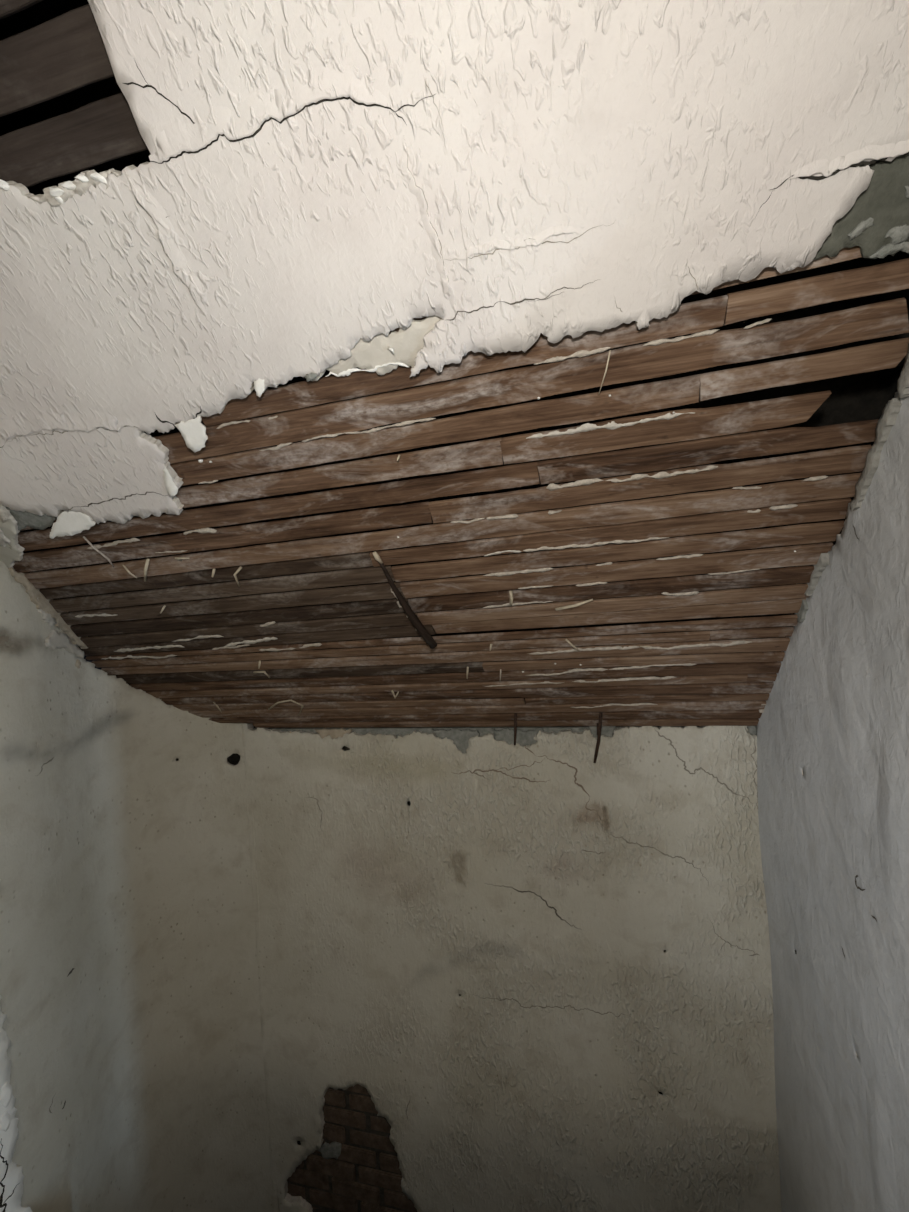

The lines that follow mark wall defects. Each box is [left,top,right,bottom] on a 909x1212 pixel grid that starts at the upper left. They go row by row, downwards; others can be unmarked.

flaking render [29,168,130,207]
crack [123,64,622,323]
flaking render [814,153,909,260]
flaking render [304,315,441,382]
flaking render [174,416,208,453]
flaking render [6,507,96,539]
crack [654,728,758,809]
crack [454,746,709,886]
crack [485,883,578,929]
crack [469,994,631,1017]
crack [0,1139,19,1212]
flaking render [287,1084,417,1212]